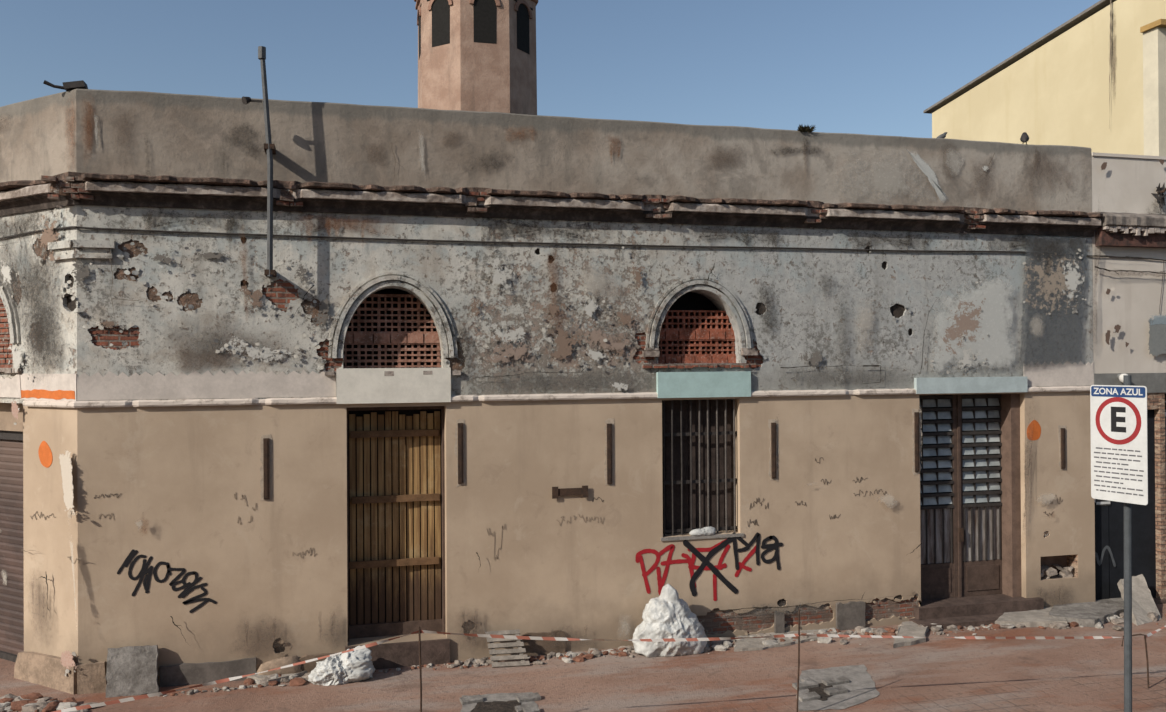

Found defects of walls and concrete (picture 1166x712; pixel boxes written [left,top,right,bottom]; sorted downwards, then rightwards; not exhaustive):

peeling [32,198,96,313]
flaking render [82,315,140,350]
flaking render [114,239,225,312]
flaking render [214,259,345,372]
flaking render [444,335,466,371]
peeling [467,247,656,373]
flaking render [890,304,911,321]
peeling [930,298,989,374]
peeling [1022,249,1086,316]
flaking render [698,599,833,637]
flaking render [865,591,922,624]